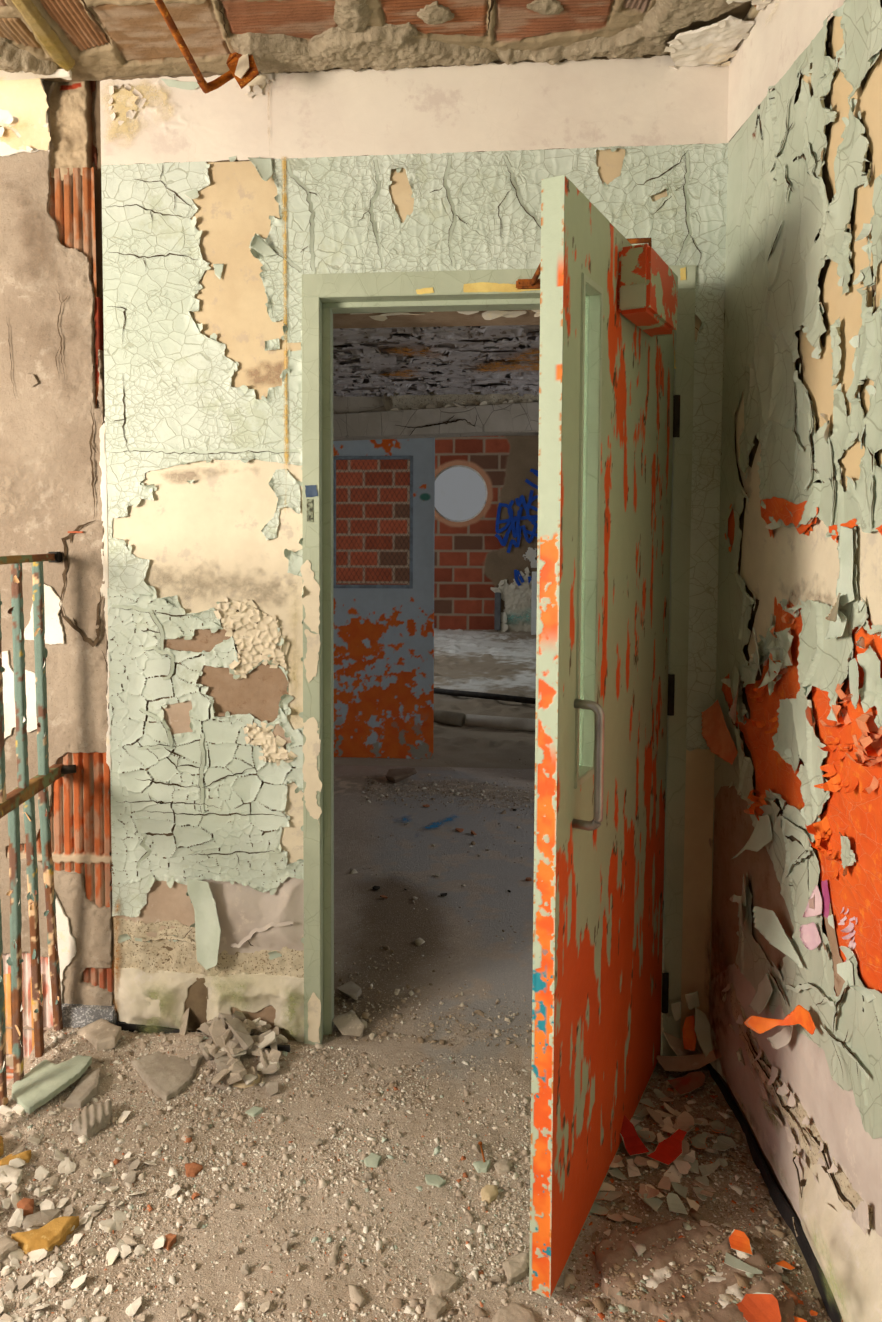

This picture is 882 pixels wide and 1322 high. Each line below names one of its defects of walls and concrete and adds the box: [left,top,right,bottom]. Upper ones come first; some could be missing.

peeling [664,39,682,53]
peeling [243,72,273,99]
crack [105,165,194,221]
crack [258,161,317,272]
peeling [798,3,882,444]
crack [110,252,197,266]
peeling [839,432,882,492]
spalling [0,78,322,1046]
peeling [590,442,882,1274]